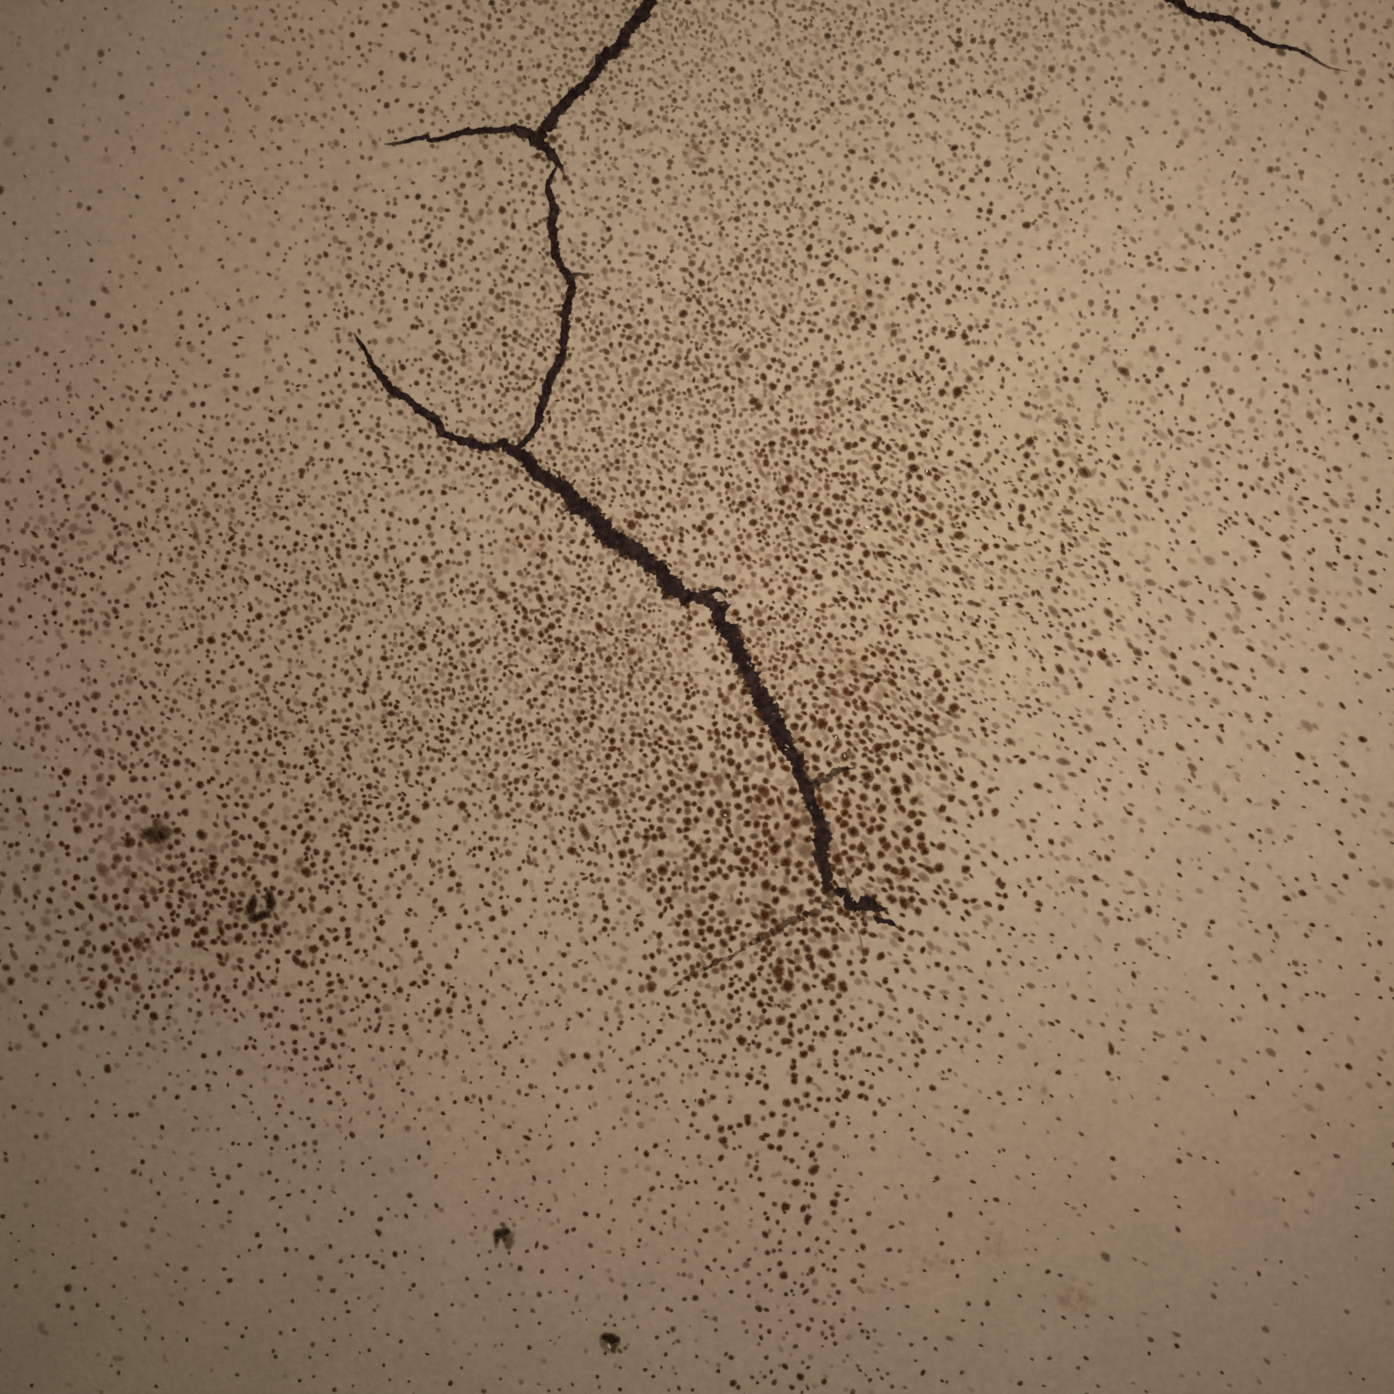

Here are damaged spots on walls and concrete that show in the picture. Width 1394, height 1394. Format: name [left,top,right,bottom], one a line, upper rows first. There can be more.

crack [351,0,897,992]
crack [1160,0,1348,75]